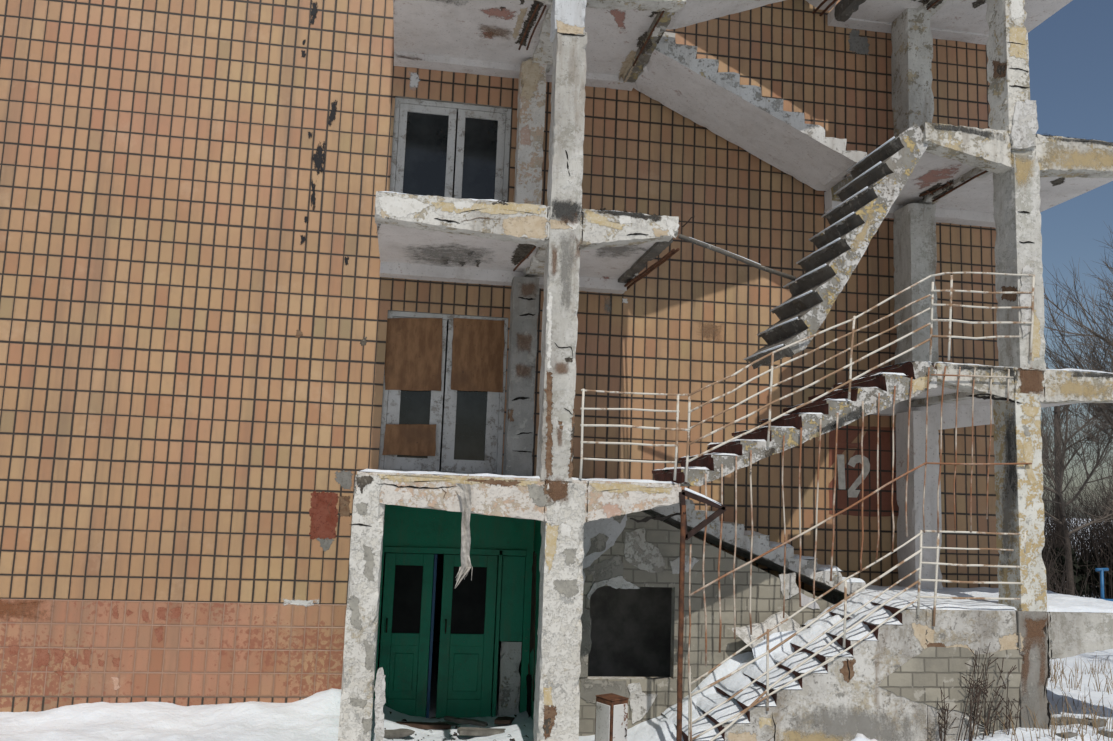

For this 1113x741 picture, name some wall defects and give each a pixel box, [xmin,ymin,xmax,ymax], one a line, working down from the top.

leakage [481,26,509,37]
spalling [481,0,547,50]
spalling [618,10,665,84]
peeling [992,0,1028,79]
peeling [1009,99,1039,162]
spalling [913,165,989,202]
peeling [1001,265,1041,361]
peeling [309,292,575,551]
peeling [363,545,375,581]
peeling [545,482,699,724]
peeling [347,595,386,741]
spalling [541,687,557,740]